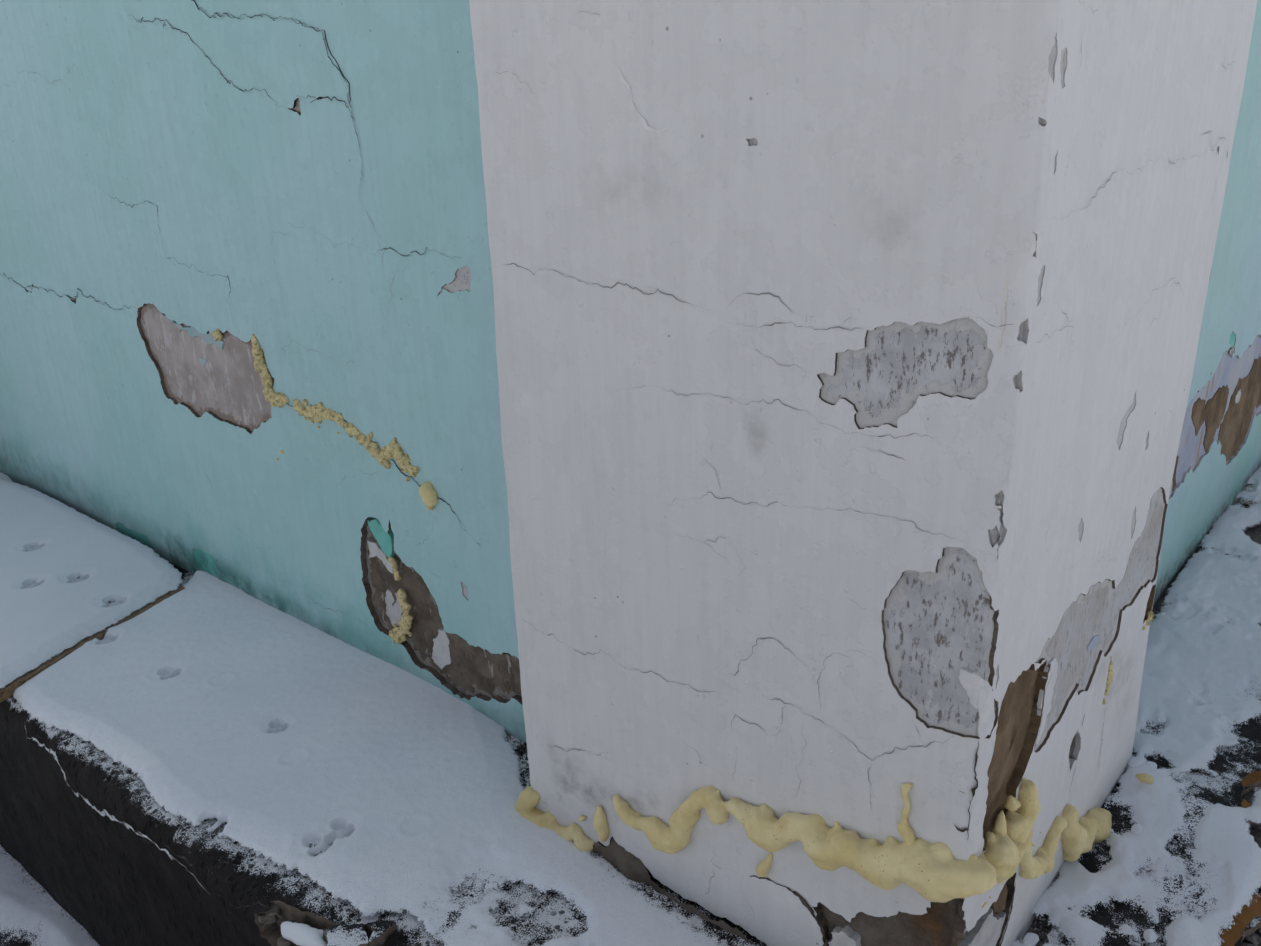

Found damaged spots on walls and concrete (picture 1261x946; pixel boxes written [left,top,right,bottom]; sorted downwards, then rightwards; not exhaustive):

crack [127,0,453,363]
flaking render [137,303,274,434]
crack [493,263,864,373]
peeling [817,317,993,429]
crack [371,440,480,546]
flaking render [360,517,523,705]
peeling [881,332,1261,851]
crack [524,620,979,838]
crack [25,728,269,927]
spalling [254,900,339,946]
spalling [592,836,764,946]
spalling [812,873,1016,946]